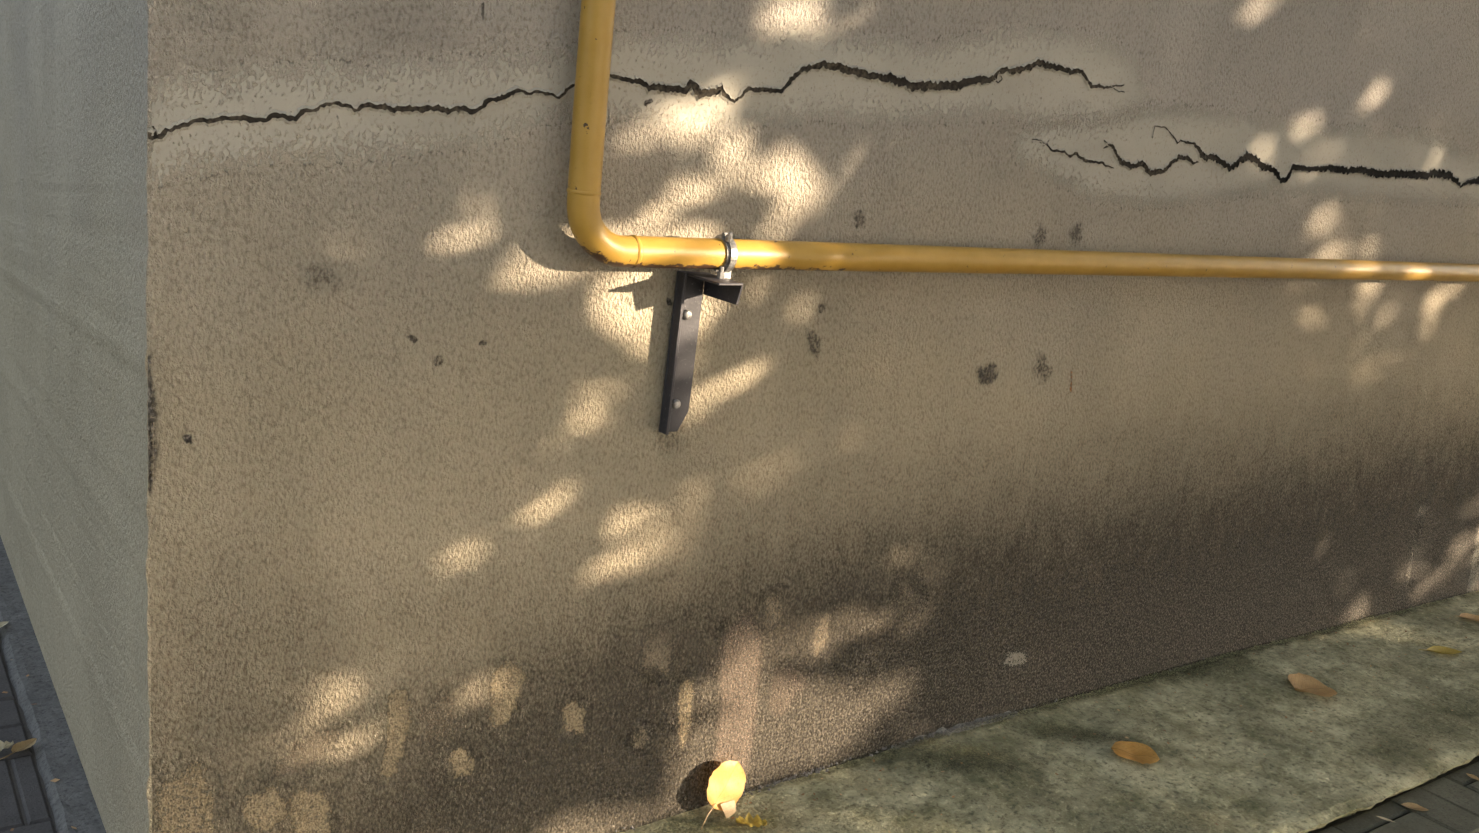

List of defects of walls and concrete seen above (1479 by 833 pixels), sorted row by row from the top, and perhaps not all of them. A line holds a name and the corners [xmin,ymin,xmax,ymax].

crack [147,57,1125,143]
crack [1032,124,1479,189]
damp [211,421,1479,833]
peeling [379,688,456,778]
peeling [488,659,527,728]
peeling [641,634,694,748]
peeling [153,760,216,833]
peeling [241,785,332,833]